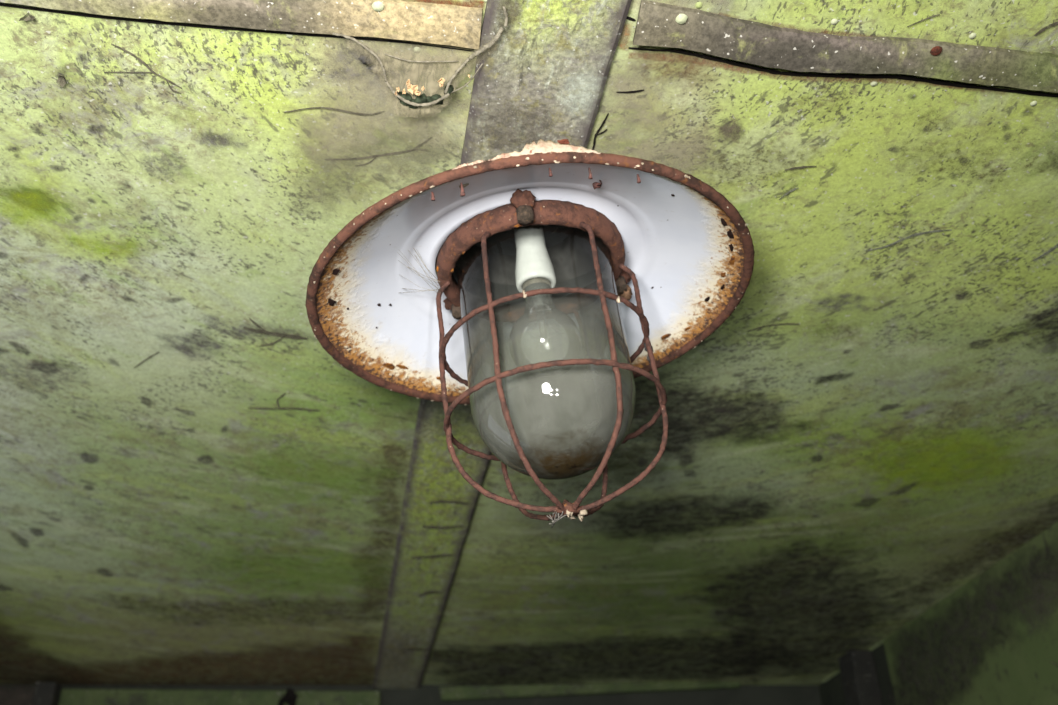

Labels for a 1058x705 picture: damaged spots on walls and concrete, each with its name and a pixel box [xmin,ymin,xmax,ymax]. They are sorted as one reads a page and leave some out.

water stain [1027,310,1058,344]
water stain [608,374,805,483]
water stain [599,497,769,538]
water stain [428,540,907,685]
water stain [0,625,375,705]